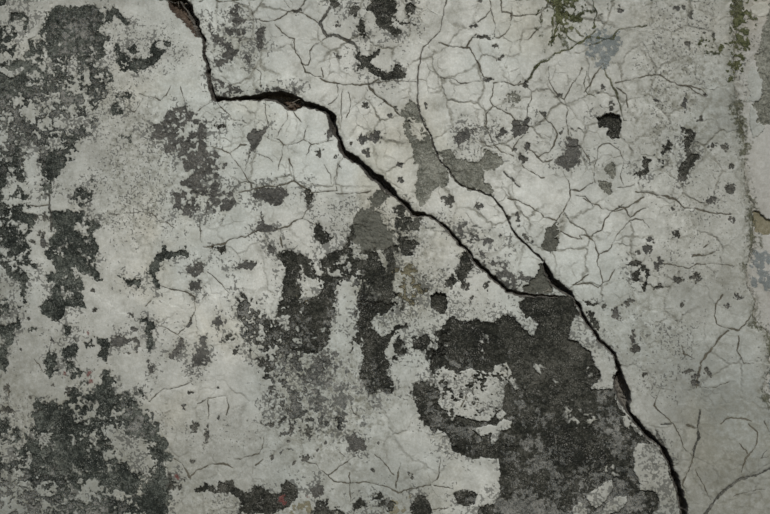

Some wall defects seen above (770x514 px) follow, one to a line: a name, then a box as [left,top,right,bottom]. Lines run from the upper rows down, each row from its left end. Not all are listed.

spalling [746,0,770,138]
spalling [596,101,622,140]
peeling [146,106,236,218]
spalling [29,211,49,248]
peeling [347,190,395,254]
crack [160,0,770,514]
crack [146,286,196,343]
spalling [602,298,635,321]
spalling [628,329,641,353]
peeling [194,479,298,514]
peeling [453,490,478,506]